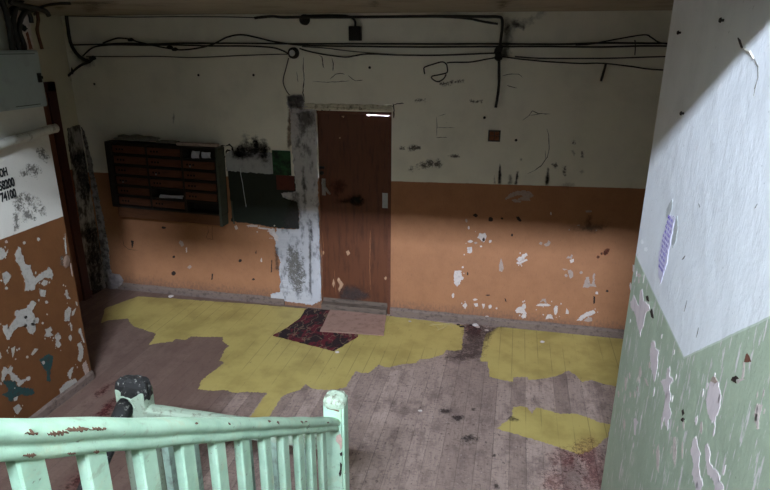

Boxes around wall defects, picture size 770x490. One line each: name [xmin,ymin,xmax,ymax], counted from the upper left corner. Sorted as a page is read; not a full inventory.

crack [737,38,758,93]
peeling [464,213,492,255]
peeling [0,237,89,417]
peeling [452,266,497,317]
peeling [515,299,569,320]
peeling [563,254,608,322]
peeling [629,265,654,336]
peeling [618,335,726,490]